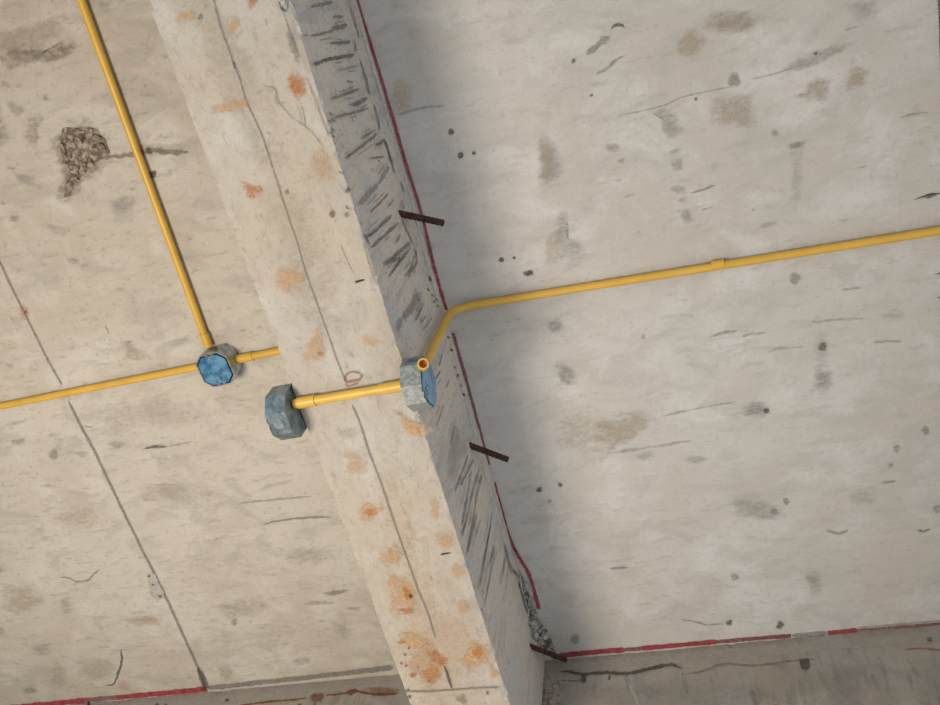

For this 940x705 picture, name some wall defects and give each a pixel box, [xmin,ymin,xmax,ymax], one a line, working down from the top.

rust [399,633,445,682]
spalling [454,442,567,662]